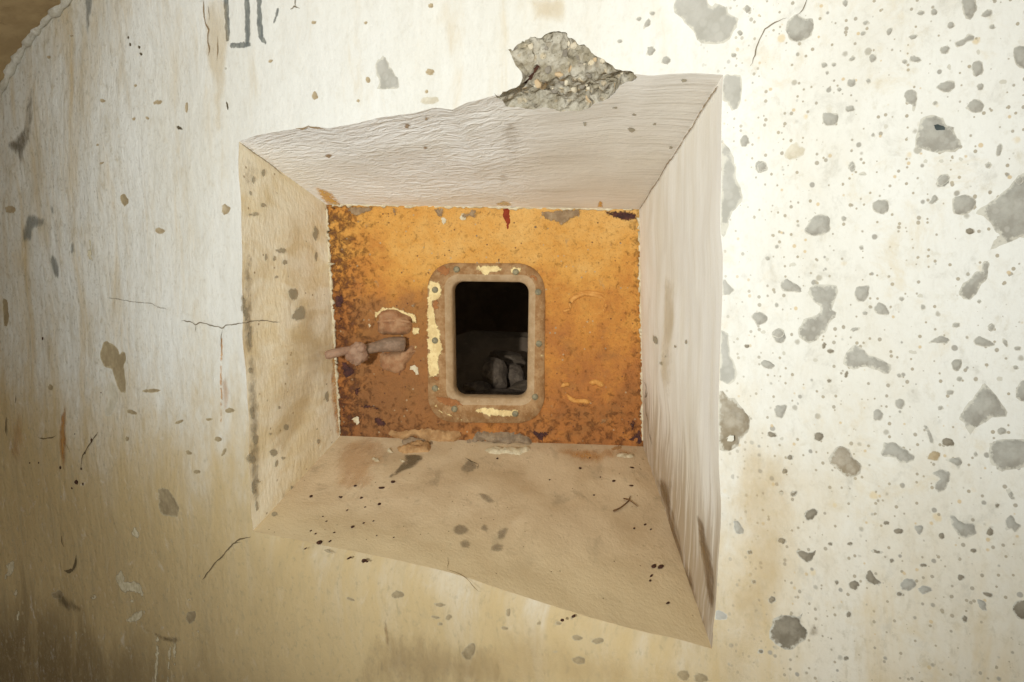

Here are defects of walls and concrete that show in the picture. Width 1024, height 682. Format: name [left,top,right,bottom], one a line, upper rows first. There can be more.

crack [750,0,807,66]
spalling [494,31,637,126]
rust [341,362,354,378]
rust [354,387,386,426]
crack [203,537,249,579]